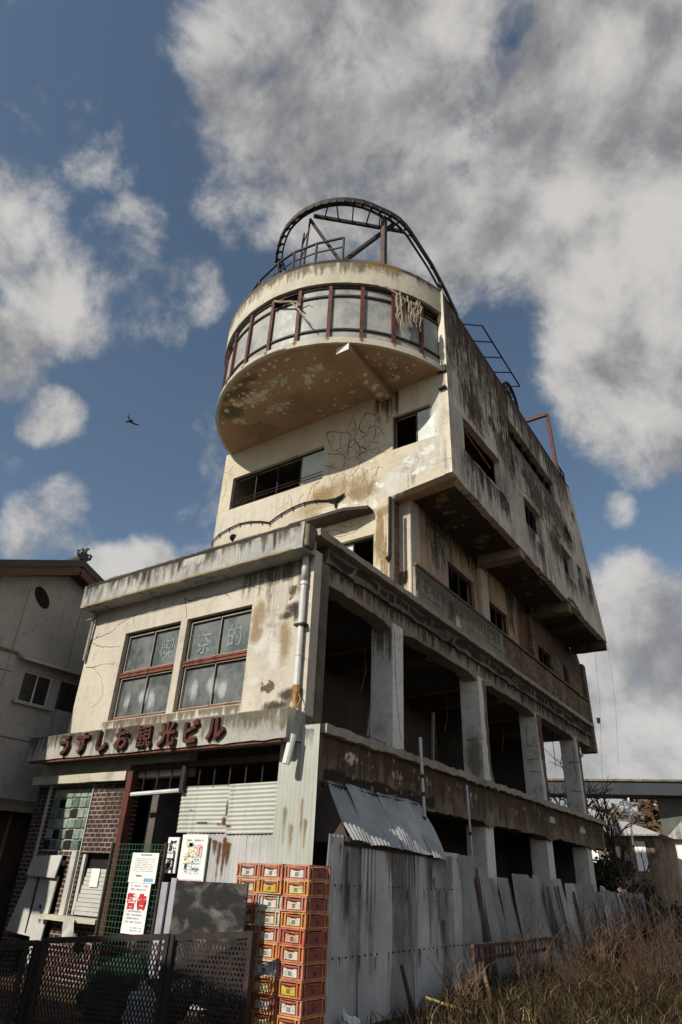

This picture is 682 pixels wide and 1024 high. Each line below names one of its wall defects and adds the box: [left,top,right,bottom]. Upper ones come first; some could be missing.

peeling [222,349,419,435]
leakage [86,488,300,595]
crack [279,404,388,537]
leakage [227,259,593,739]
spalling [260,680,275,693]
rust [196,798,231,877]
rust [283,806,306,844]
leakage [323,735,603,848]